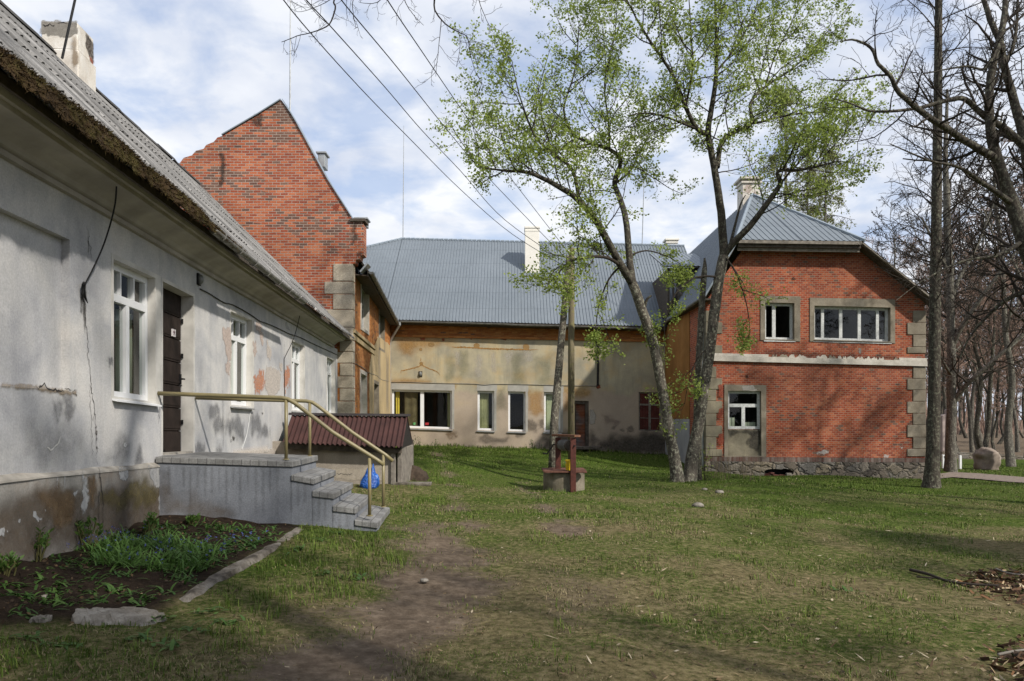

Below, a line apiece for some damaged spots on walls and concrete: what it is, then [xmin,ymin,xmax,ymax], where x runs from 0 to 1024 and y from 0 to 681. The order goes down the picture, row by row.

peeling [222,327,232,375]
peeling [253,363,290,395]
crack [38,303,104,528]
peeling [74,476,89,511]
leakage [0,476,159,561]